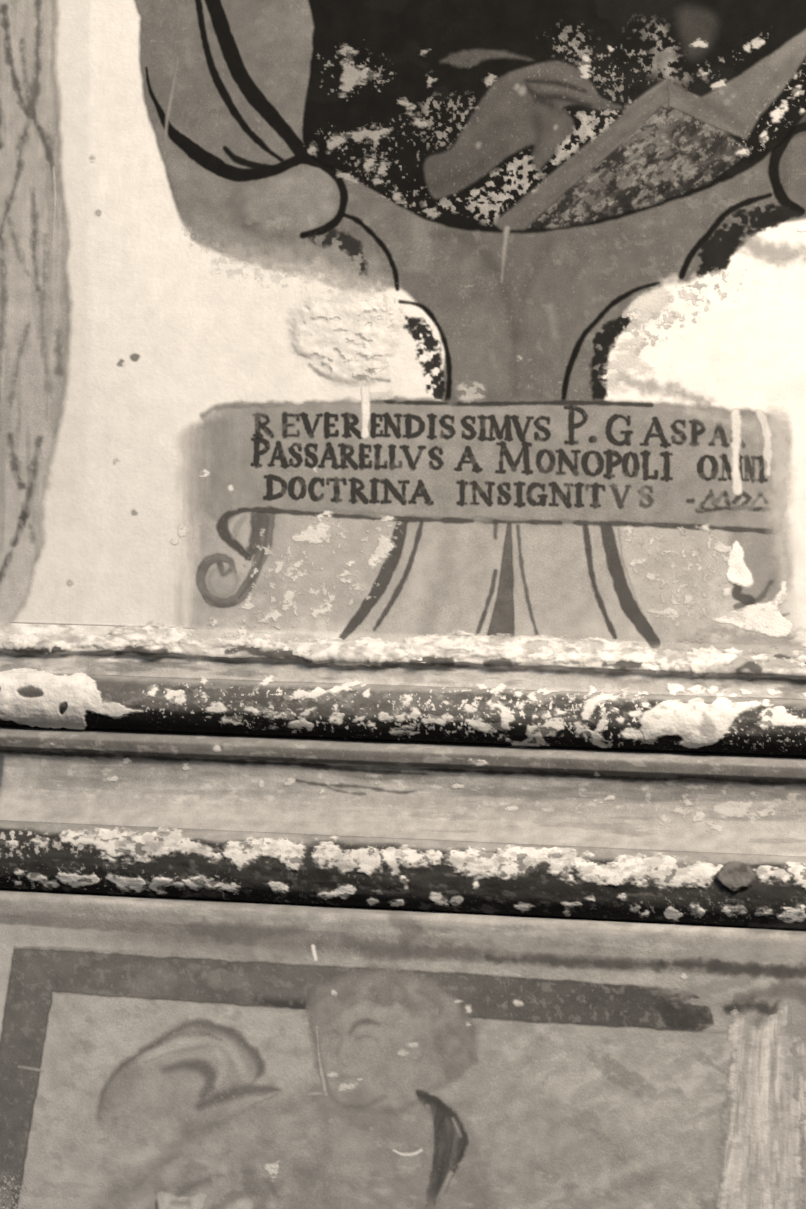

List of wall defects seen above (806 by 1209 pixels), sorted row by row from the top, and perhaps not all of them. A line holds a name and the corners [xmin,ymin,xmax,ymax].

peeling [307,25,769,223]
peeling [736,63,805,157]
spalling [743,237,798,261]
peeling [605,271,741,404]
peeling [0,511,806,751]
peeling [659,795,776,832]
peeling [0,824,806,923]